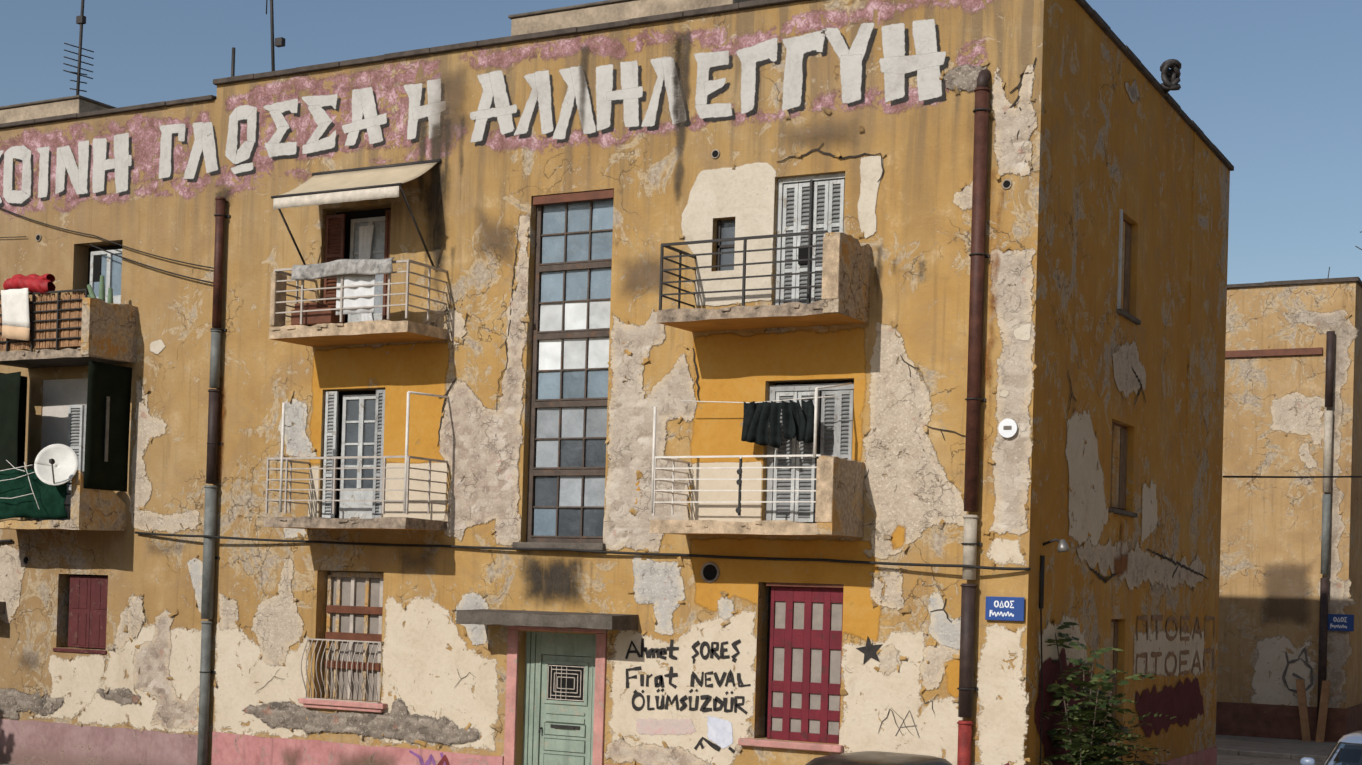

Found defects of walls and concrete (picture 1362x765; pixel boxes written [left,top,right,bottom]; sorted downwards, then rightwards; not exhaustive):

flaking render [939,59,1039,190]
flaking render [0,543,30,624]
flaking render [129,381,201,534]
peeling [0,555,502,751]
flaking render [283,528,307,540]
flaking render [439,214,530,546]
damp [525,559,578,600]
flaking render [603,309,757,765]
flaking render [862,320,967,614]
peeling [839,589,1091,765]
flaking render [983,245,1037,567]
peeling [1064,408,1206,592]